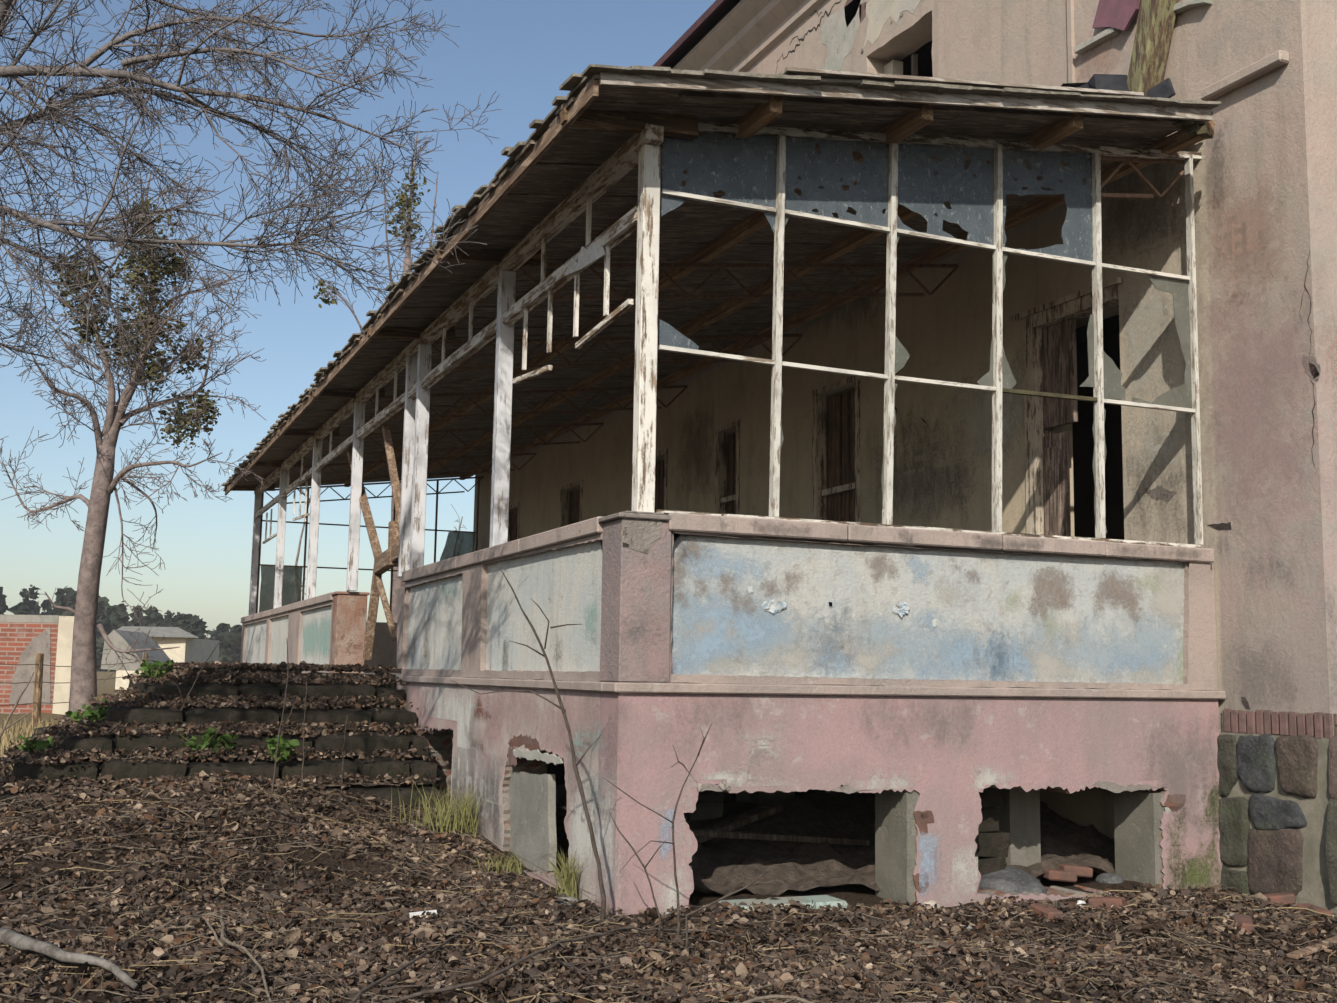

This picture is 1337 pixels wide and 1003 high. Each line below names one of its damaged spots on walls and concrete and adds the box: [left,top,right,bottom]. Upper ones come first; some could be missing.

crack [776,1,841,70]
peeling [821,0,922,70]
crack [1299,252,1316,466]
peeling [722,573,797,614]
spalling [508,737,563,766]
peeling [696,770,755,792]
peeling [660,862,692,914]